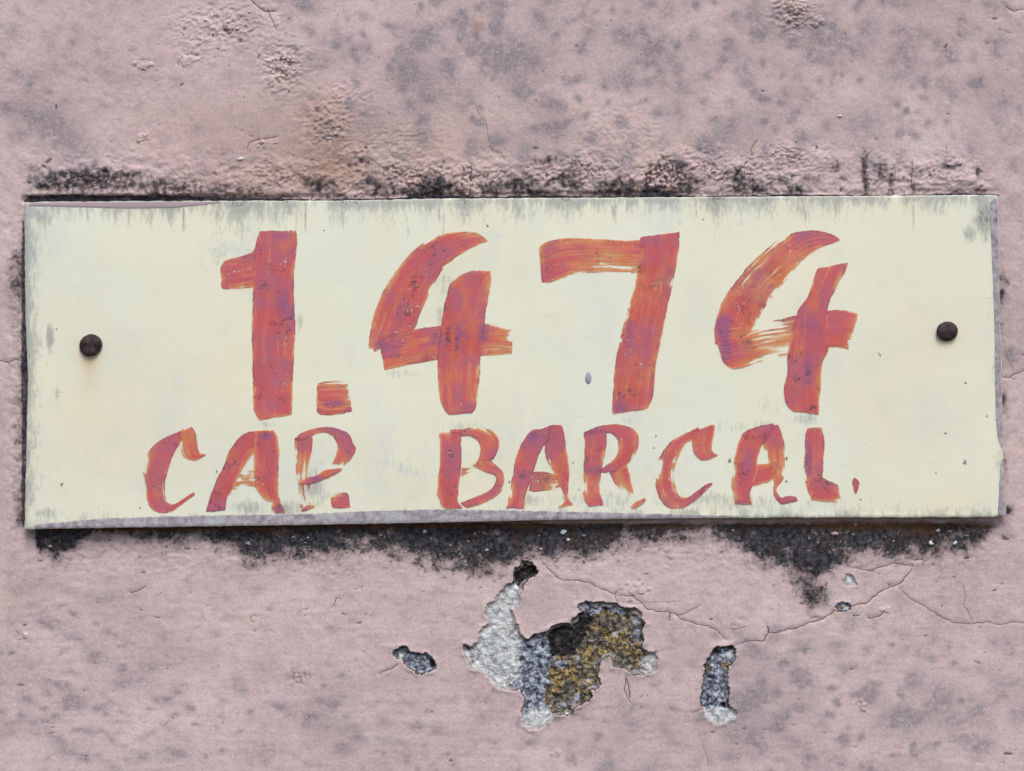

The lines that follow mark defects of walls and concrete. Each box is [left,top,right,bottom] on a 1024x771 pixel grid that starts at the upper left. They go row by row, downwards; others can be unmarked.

mould [24,156,999,202]
leakage [10,221,1008,609]
flaking render [393,646,436,676]
flaking render [463,560,658,730]
flaking render [700,645,737,725]
crack [541,558,1024,646]